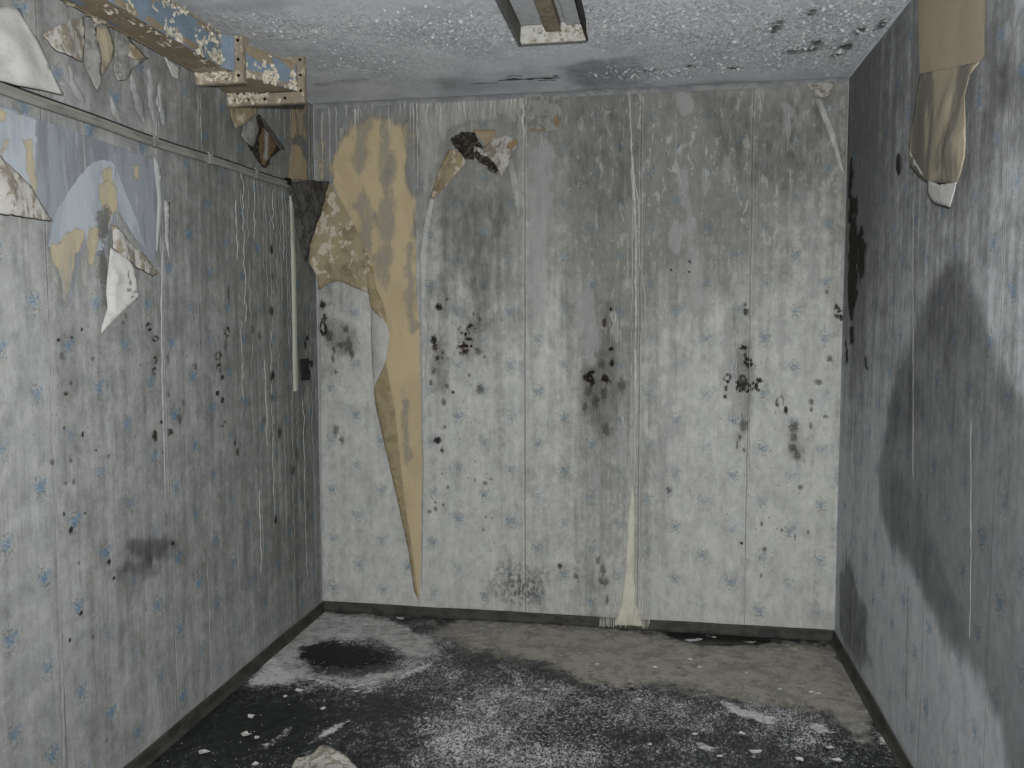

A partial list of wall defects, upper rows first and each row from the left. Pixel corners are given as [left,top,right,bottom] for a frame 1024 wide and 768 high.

peeling [918,0,986,73]
peeling [0,104,170,307]
peeling [246,104,423,599]
water stain [457,318,481,354]
spalling [450,131,496,160]
water stain [583,92,650,629]
water stain [721,333,762,398]
water stain [834,157,866,364]